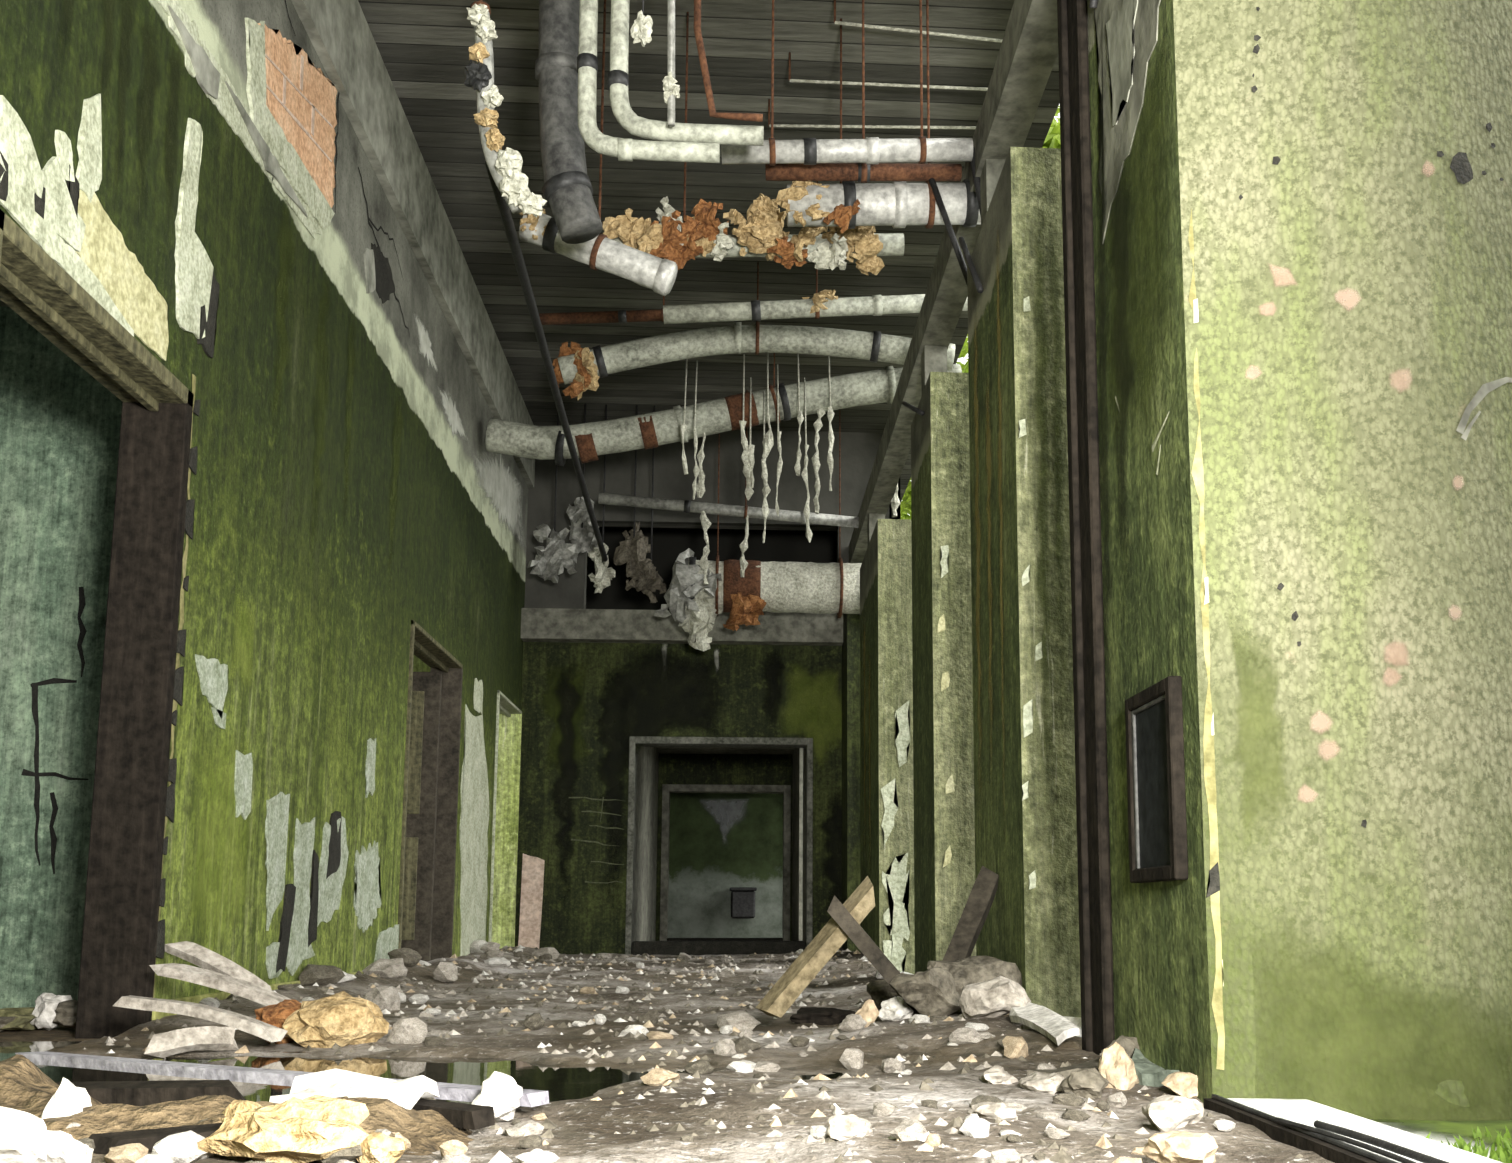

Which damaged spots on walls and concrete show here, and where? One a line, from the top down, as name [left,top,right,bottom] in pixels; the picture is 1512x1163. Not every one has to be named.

flaking render [0,94,219,361]
flaking render [157,0,340,239]
flaking render [153,374,228,998]
peeling [234,750,402,979]
peeling [365,738,376,798]
water stain [552,674,580,878]
water stain [599,650,719,891]
water stain [705,800,746,837]
water stain [764,652,783,718]
water stain [821,794,842,905]
peeling [881,701,910,972]